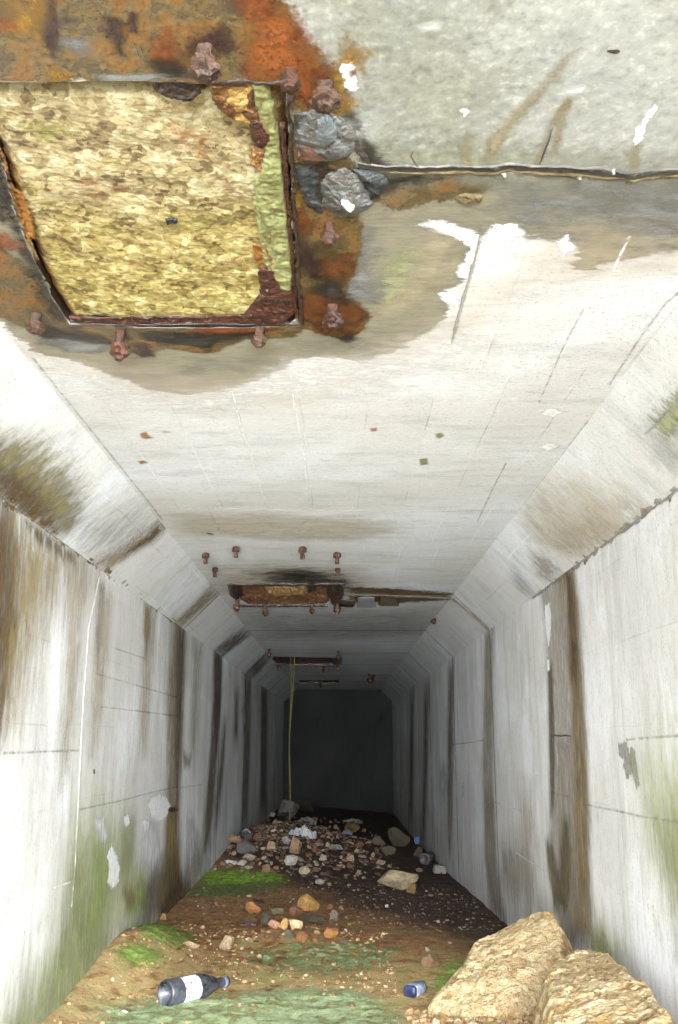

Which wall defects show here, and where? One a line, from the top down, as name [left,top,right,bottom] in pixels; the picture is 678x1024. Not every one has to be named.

rust [0,0,423,343]
water stain [0,0,678,395]
crack [451,234,481,344]
water stain [0,439,81,726]
water stain [142,591,267,916]
water stain [250,568,532,916]
water stain [535,557,591,941]